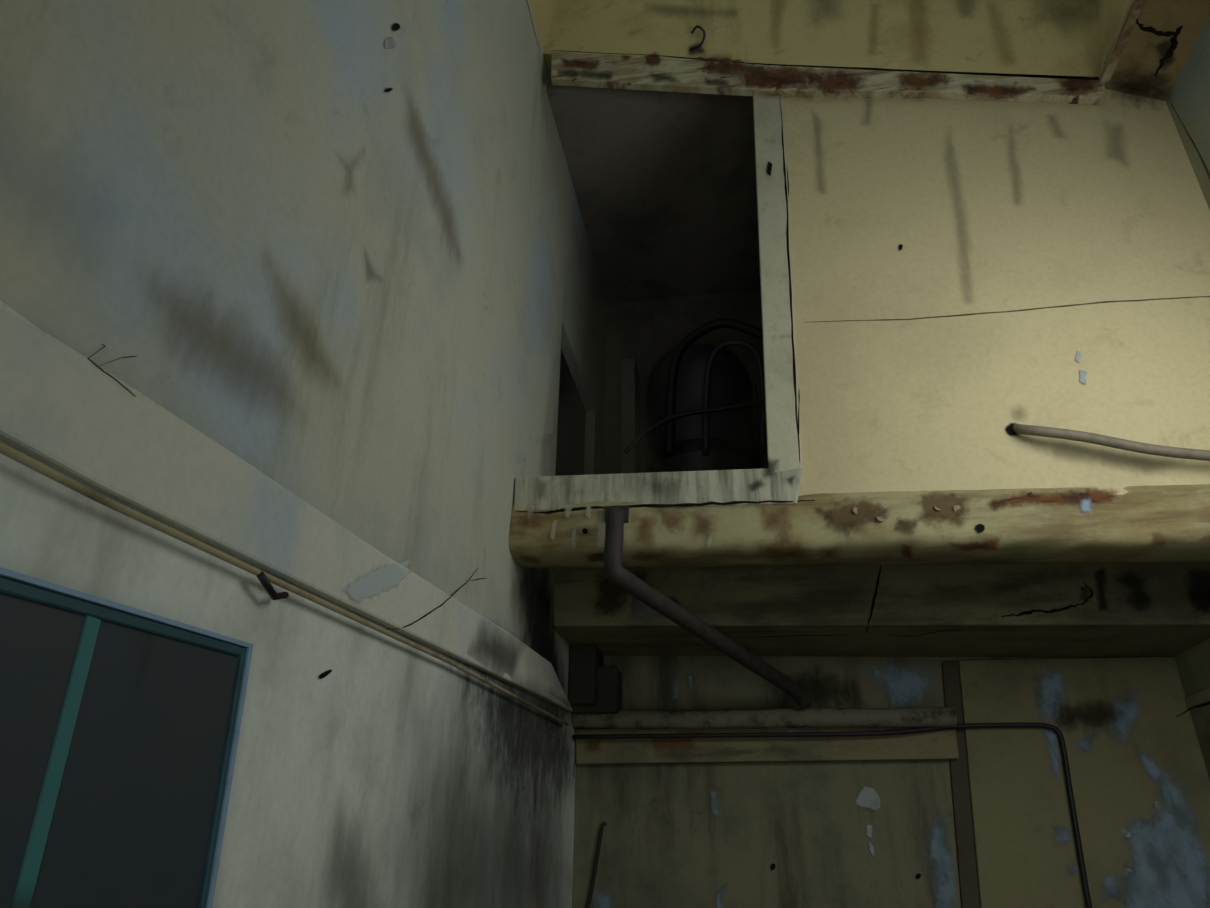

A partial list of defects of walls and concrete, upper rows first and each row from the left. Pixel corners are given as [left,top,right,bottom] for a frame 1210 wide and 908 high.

corrosion [562,59,599,69]
corrosion [645,53,660,65]
corrosion [700,57,863,95]
corrosion [900,73,948,97]
corrosion [963,84,1035,99]
crack [1135,19,1183,76]
crack [866,565,966,637]
crack [1001,582,1094,617]
peeling [1038,673,1064,773]
crack [1176,702,1210,717]
leakage [429,671,569,908]
peeling [1103,750,1210,908]